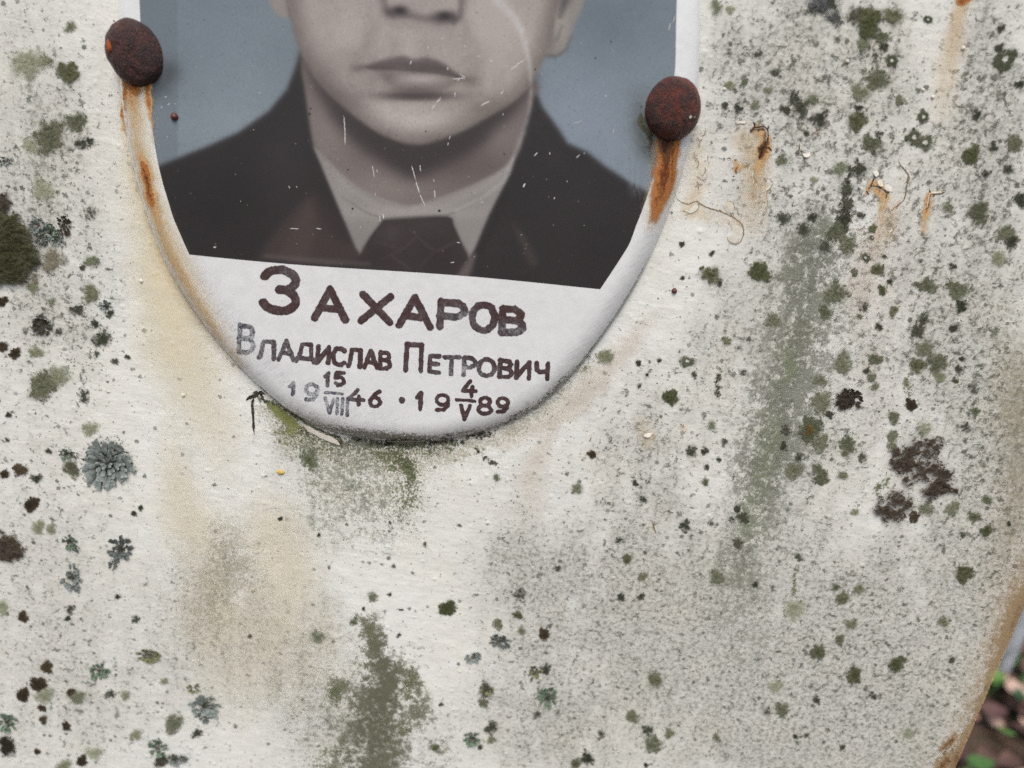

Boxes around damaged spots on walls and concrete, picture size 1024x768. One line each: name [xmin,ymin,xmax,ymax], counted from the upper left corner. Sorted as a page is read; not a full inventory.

rust [952,0,971,41]
rust [119,78,153,134]
rust [734,125,772,175]
rust [649,138,681,223]
rust [866,180,889,233]
rust [135,144,217,333]
damp [325,680,348,707]
damp [402,662,419,699]
damp [304,743,348,768]